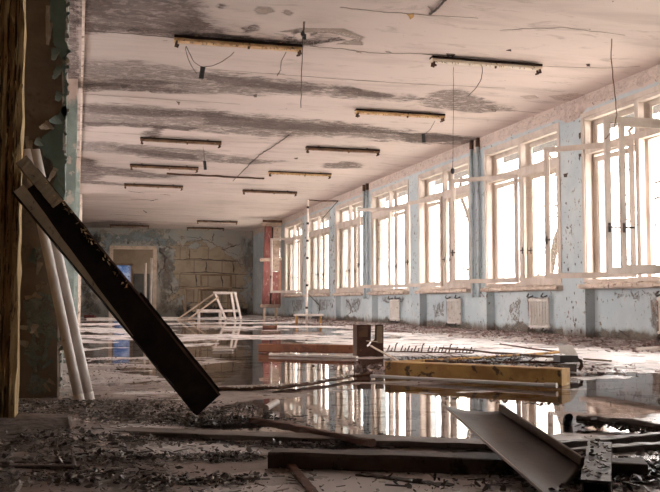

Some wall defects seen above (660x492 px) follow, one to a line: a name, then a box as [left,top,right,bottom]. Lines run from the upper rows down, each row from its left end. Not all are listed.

water stain [66,0,512,113]
peeling [24,0,71,202]
water stain [77,103,474,145]
crack [157,239,179,303]
flaking render [99,228,253,313]